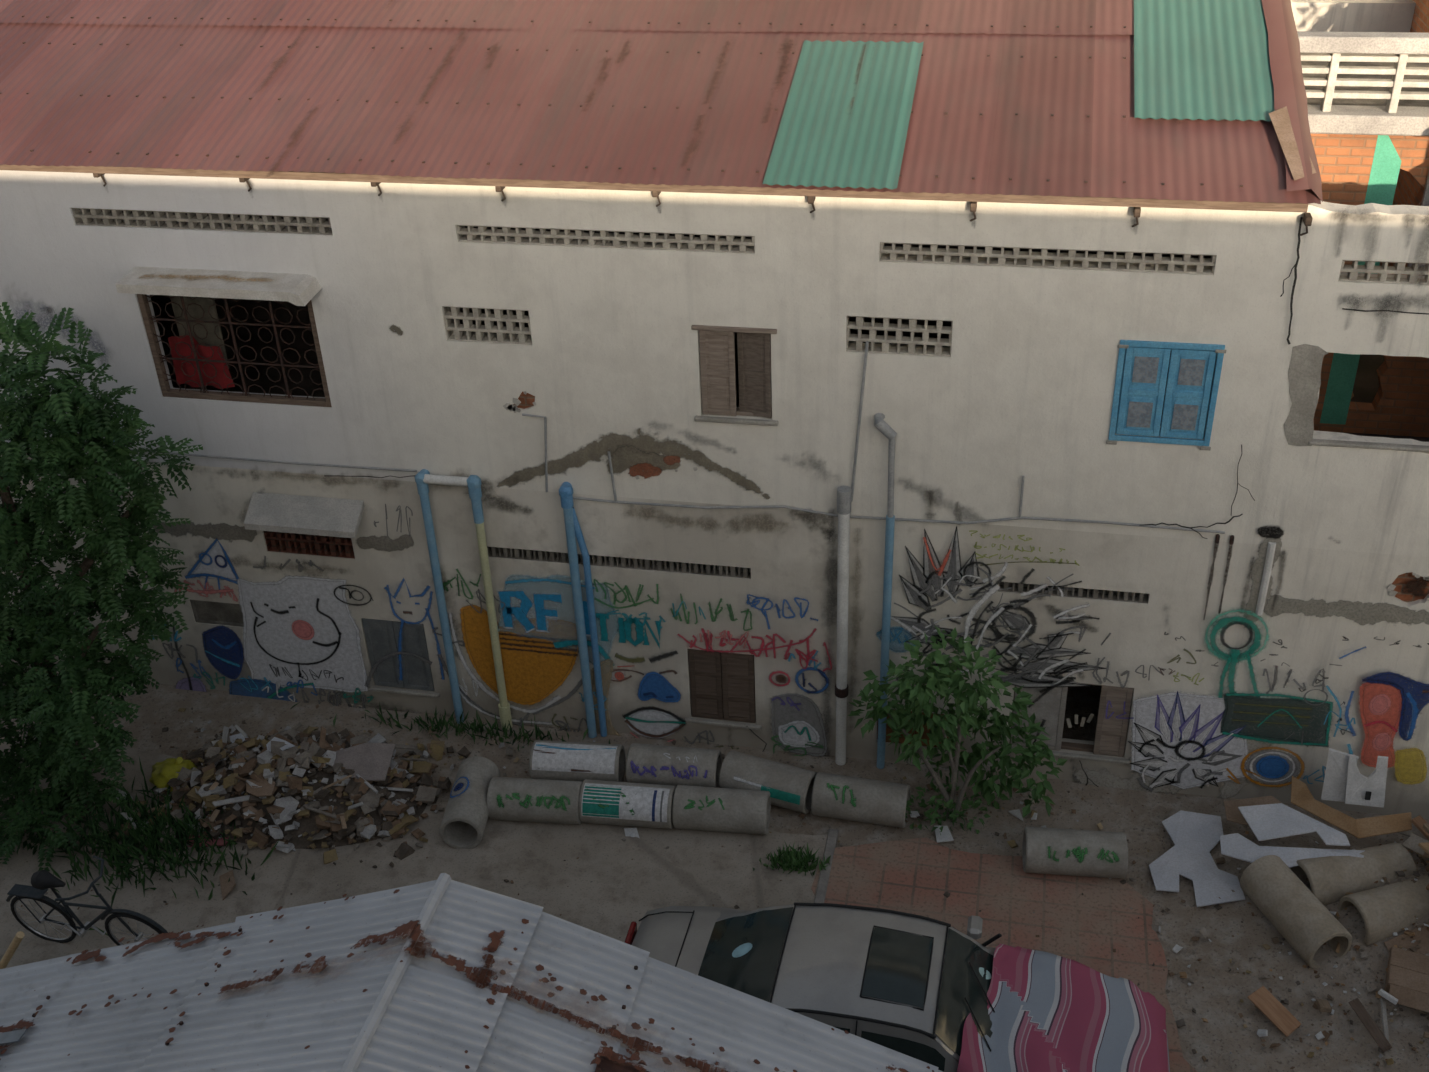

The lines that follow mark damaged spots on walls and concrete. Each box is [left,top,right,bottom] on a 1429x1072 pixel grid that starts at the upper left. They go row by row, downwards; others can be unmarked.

flaking render [497,428,770,499]
spalling [1387,572,1429,602]
corrosion [66,906,328,996]
corrosion [0,990,43,1060]
corrosion [163,989,185,1043]
corrosion [347,919,728,1072]